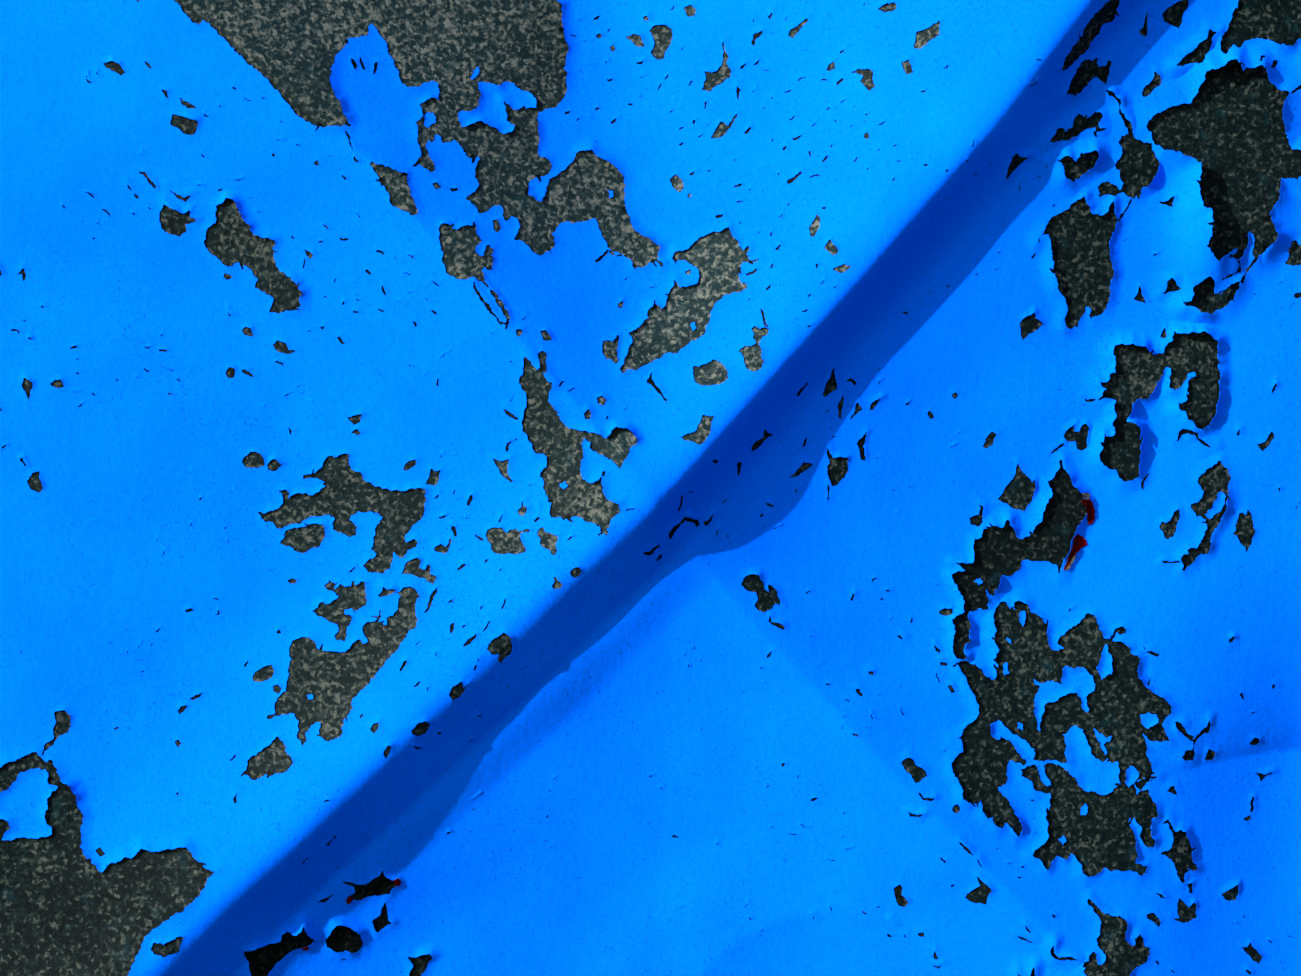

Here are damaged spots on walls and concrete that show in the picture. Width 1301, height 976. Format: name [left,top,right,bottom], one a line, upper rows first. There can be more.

peeling [159,0,759,373]
peeling [1038,0,1301,329]
peeling [486,330,637,555]
peeling [1064,328,1221,481]
peeling [242,452,452,780]
peeling [939,459,1198,927]
peeling [0,710,215,976]
peeling [244,871,401,976]
peeling [1083,899,1150,976]